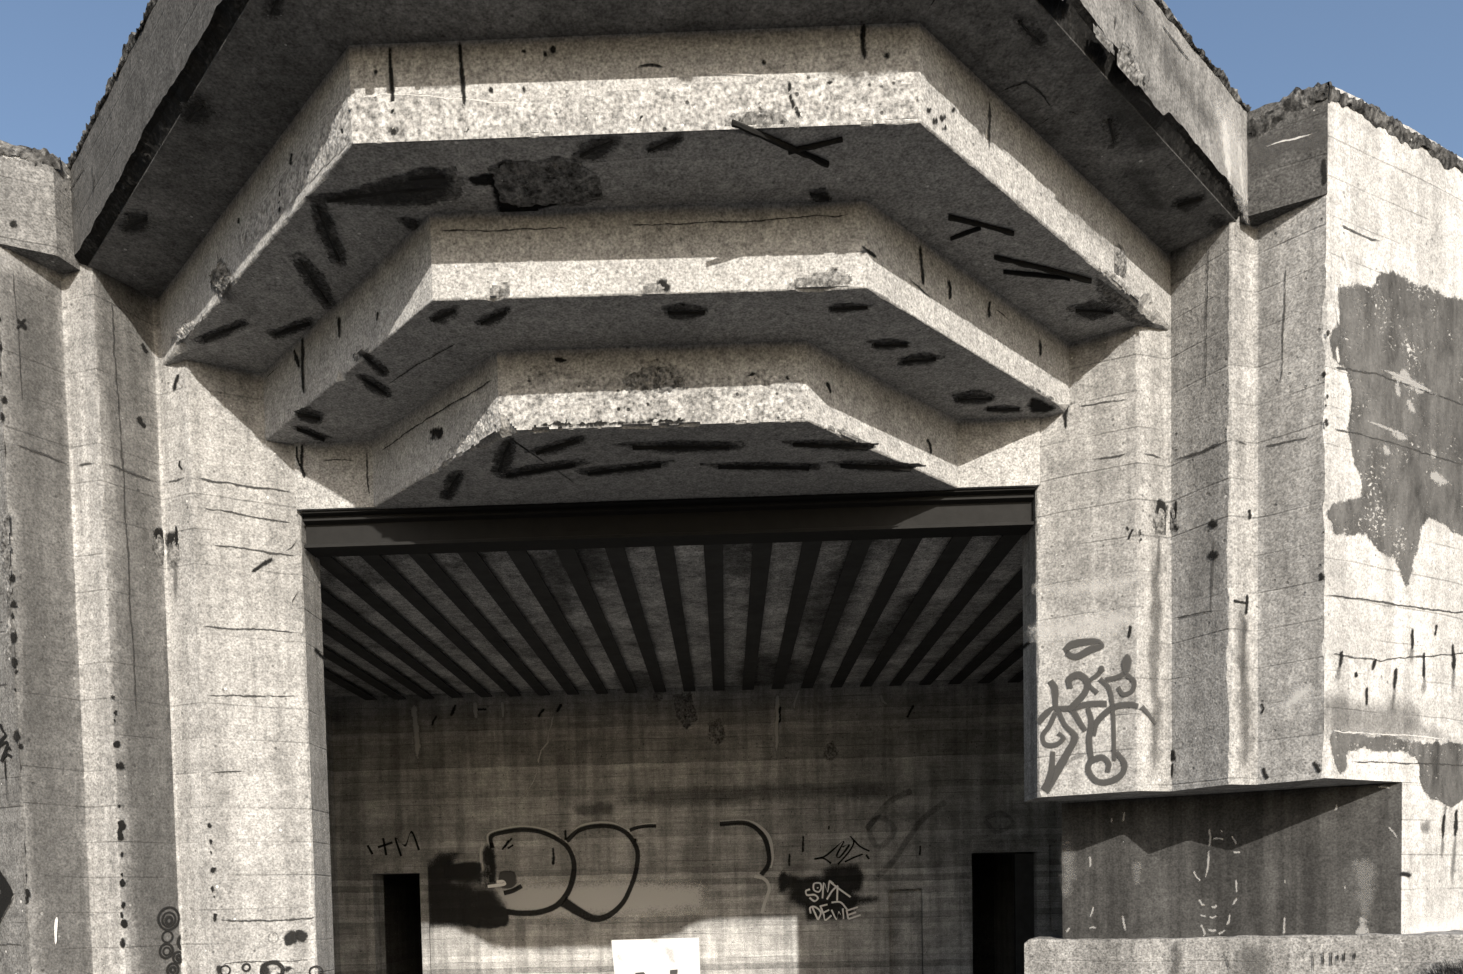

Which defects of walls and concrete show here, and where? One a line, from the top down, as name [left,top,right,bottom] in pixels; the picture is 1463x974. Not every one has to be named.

spalling [237,60,955,252]
spalling [209,255,234,297]
spalling [490,282,510,298]
spalling [643,279,671,294]
spalling [787,267,852,290]
water stain [1330,730,1415,774]